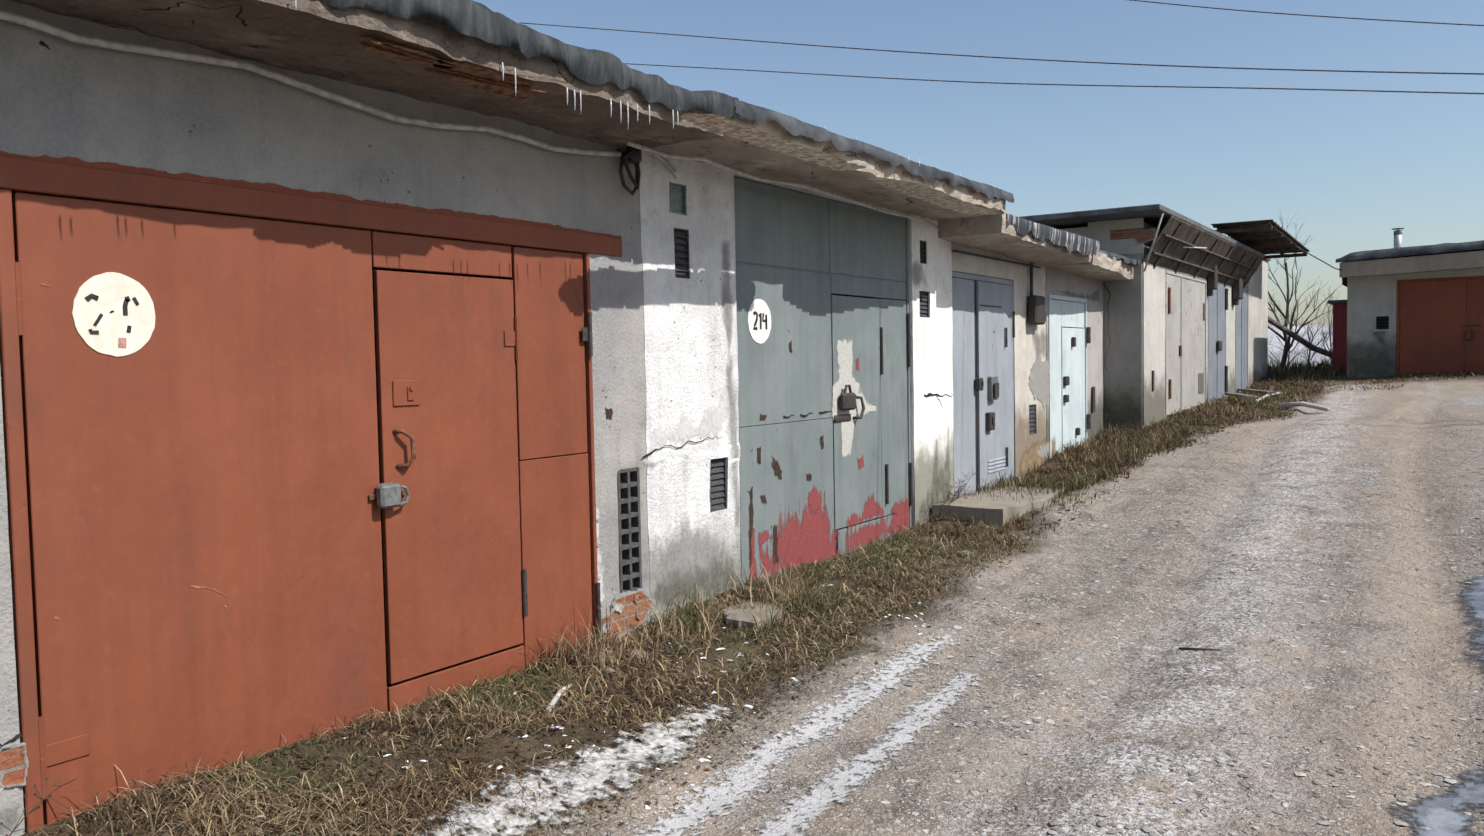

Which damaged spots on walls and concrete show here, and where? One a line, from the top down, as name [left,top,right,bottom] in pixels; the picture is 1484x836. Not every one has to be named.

peeling [596,510,726,643]
peeling [749,485,909,581]
flaking render [0,742,29,793]